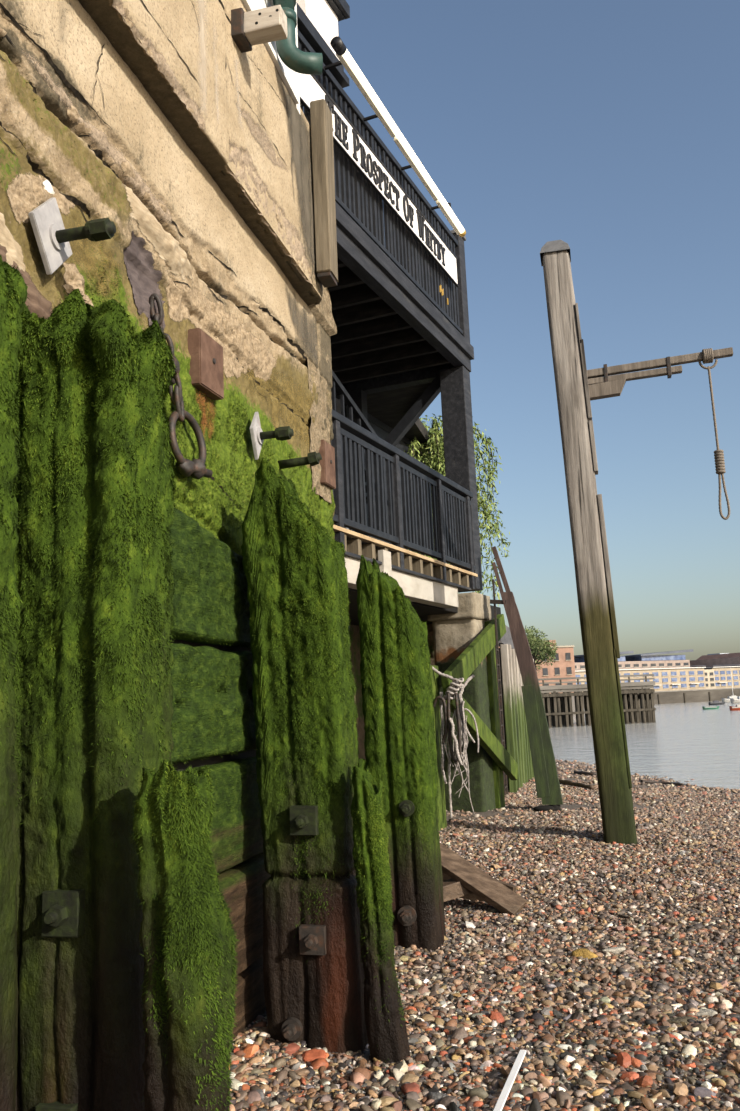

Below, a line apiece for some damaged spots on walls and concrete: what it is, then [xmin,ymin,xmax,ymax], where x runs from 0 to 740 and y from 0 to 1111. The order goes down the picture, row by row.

crack [0,3,119,178]